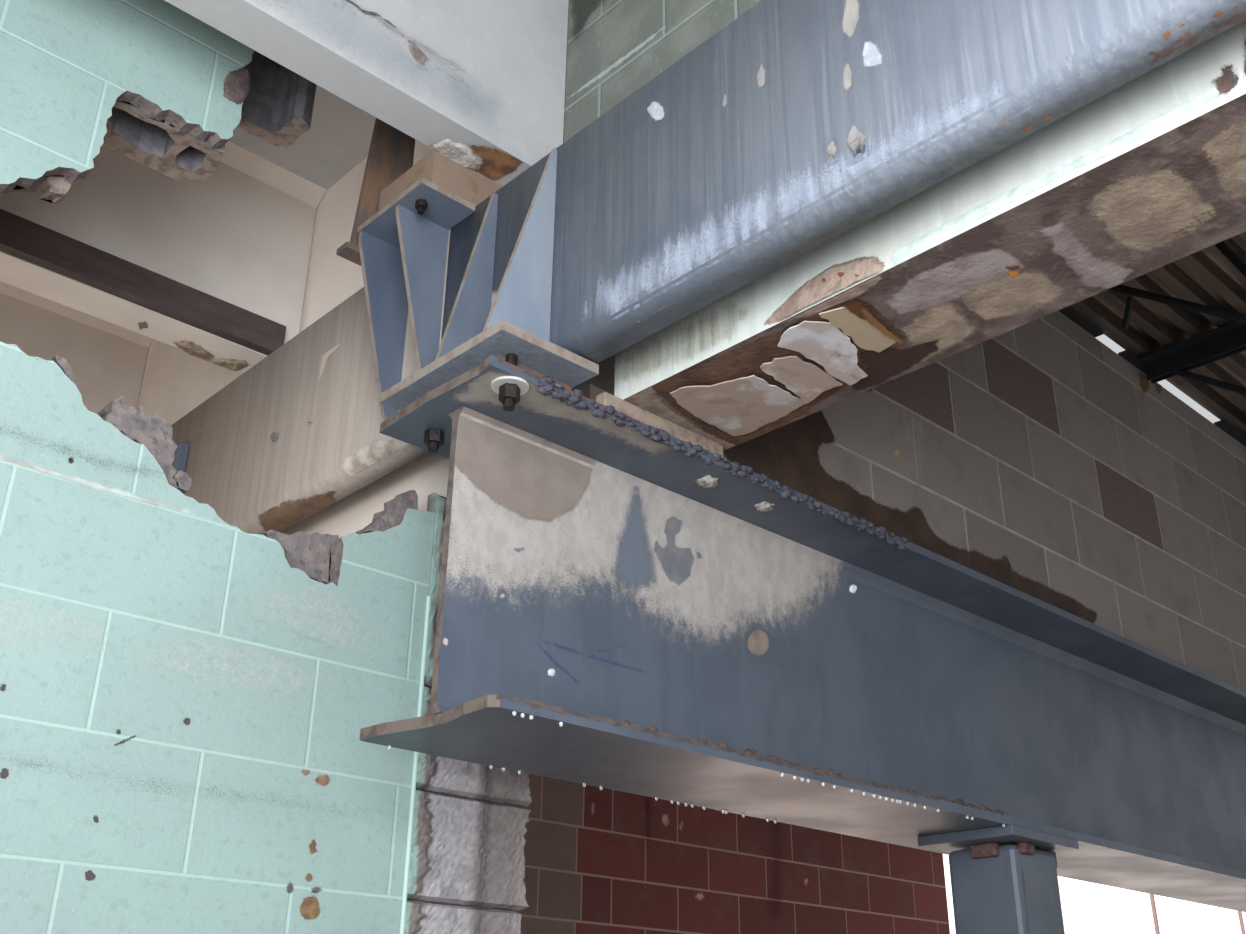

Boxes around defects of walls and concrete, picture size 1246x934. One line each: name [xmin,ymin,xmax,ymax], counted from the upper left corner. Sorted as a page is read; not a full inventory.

spalling [223,68,251,104]
peeling [625,38,1246,450]
spalling [50,355,79,390]
spalling [173,341,251,371]
spalling [97,396,178,489]
leakage [445,370,849,656]
spalling [259,529,339,584]